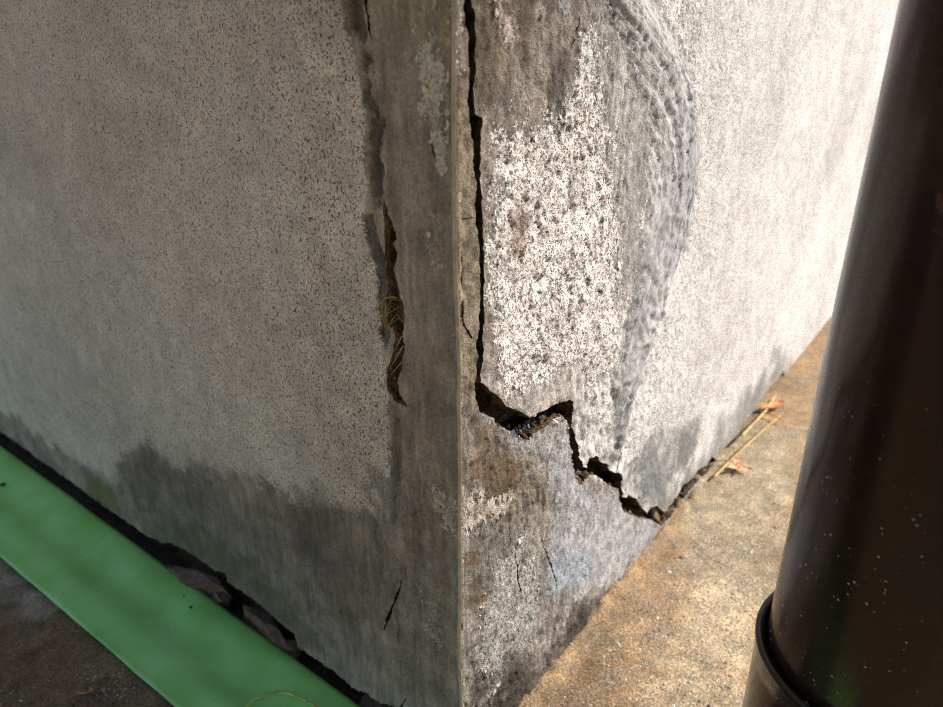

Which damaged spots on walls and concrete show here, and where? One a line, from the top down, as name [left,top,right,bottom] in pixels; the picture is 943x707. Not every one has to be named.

crack [364,0,372,40]
peeling [491,0,523,52]
crack [382,199,407,407]
peeling [483,68,629,403]
crack [461,0,717,526]
crack [384,580,402,630]